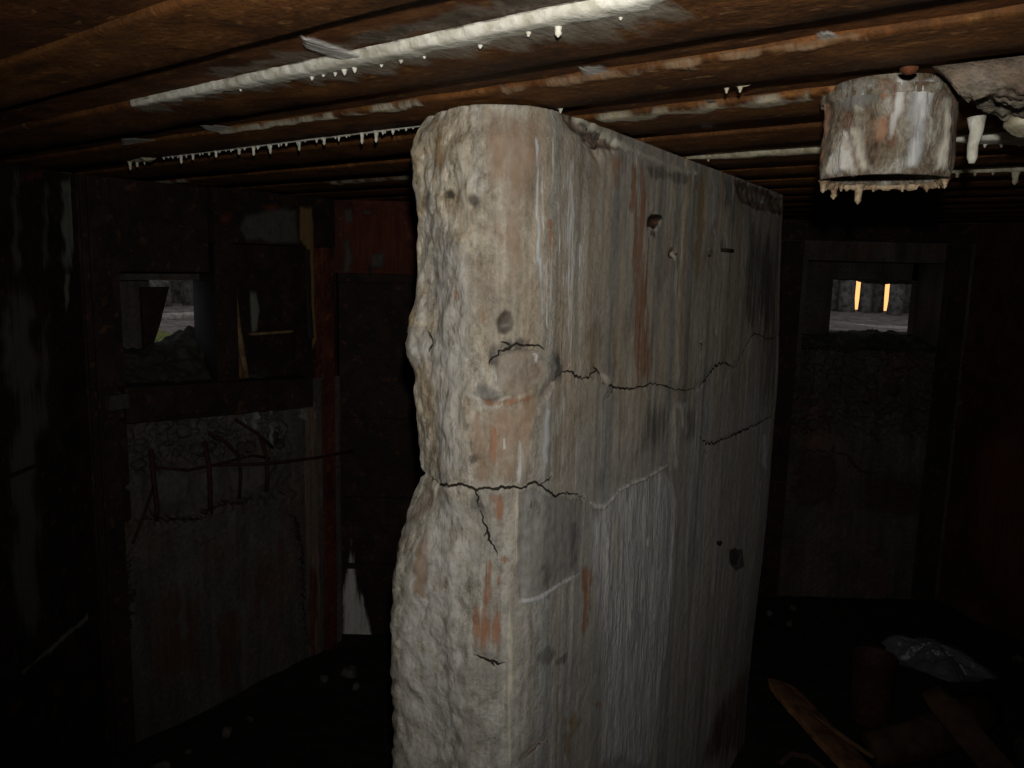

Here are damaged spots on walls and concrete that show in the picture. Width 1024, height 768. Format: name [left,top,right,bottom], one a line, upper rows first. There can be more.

efflorescence [130,0,684,111]
efflorescence [664,57,699,70]
efflorescence [720,50,739,61]
efflorescence [775,32,856,52]
efflorescence [200,112,337,134]
efflorescence [373,101,420,113]
efflorescence [127,126,420,170]
crack [489,341,544,366]
crack [545,332,780,398]
crack [699,408,775,453]
crack [432,475,584,557]
corrosion [473,565,500,647]